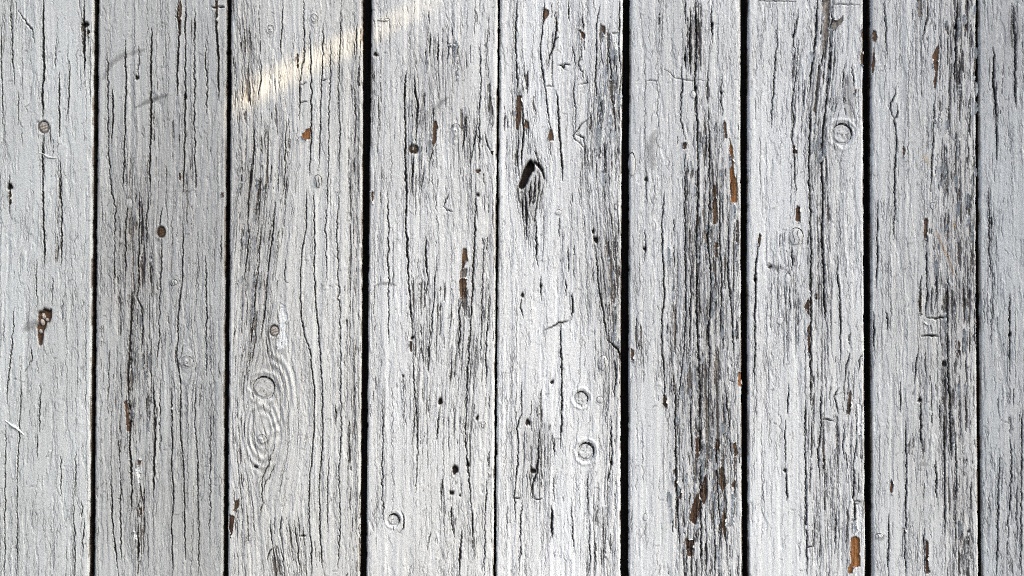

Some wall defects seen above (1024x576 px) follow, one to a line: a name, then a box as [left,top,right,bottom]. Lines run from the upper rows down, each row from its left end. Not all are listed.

peeling [515,95,529,130]
peeling [459,248,469,299]
crack [513,1,621,576]
peeling [663,122,742,574]
peeling [848,498,862,573]